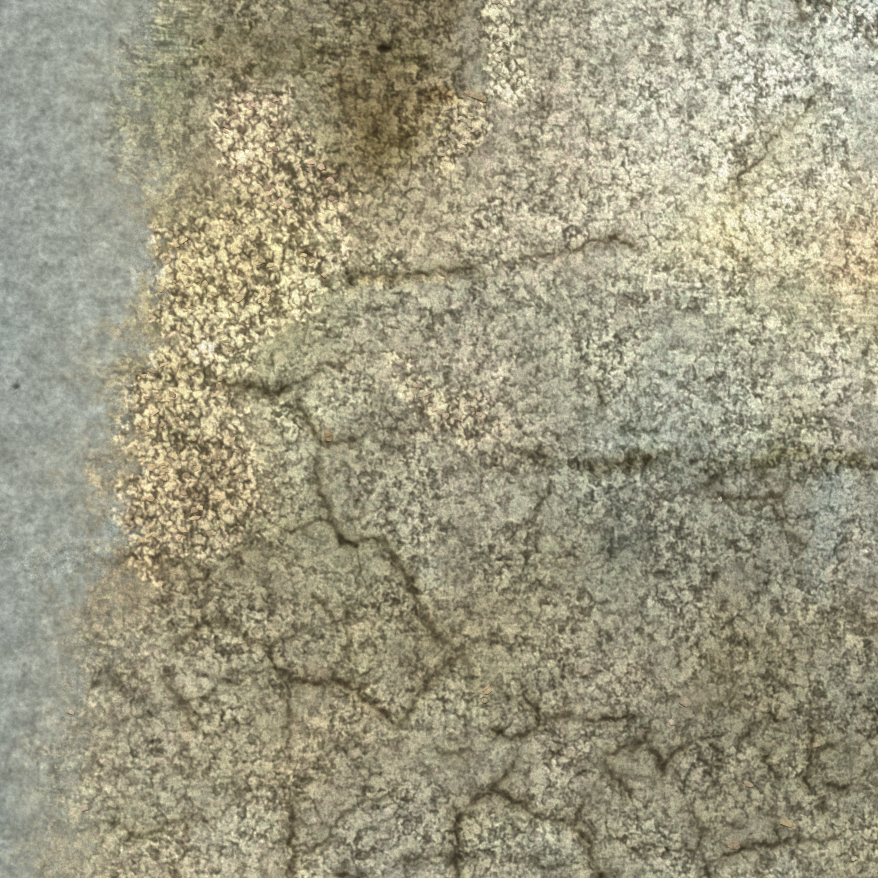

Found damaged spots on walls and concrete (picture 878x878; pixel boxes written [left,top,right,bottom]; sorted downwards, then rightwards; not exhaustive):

crack [332,222,647,303]
crack [0,343,878,878]